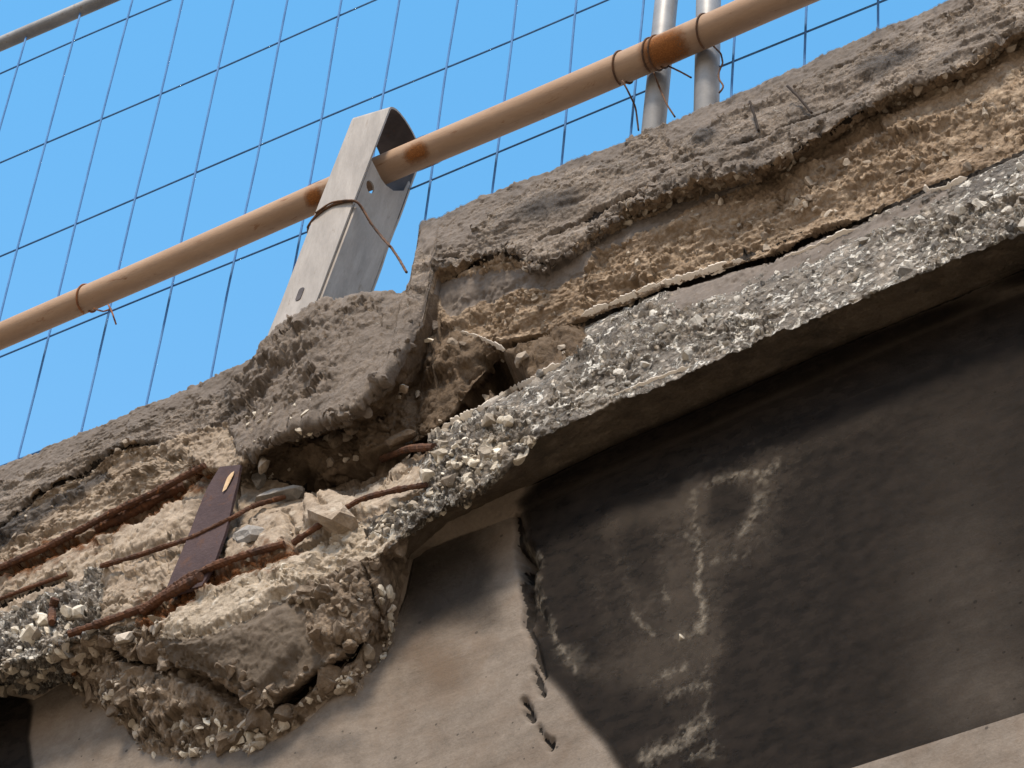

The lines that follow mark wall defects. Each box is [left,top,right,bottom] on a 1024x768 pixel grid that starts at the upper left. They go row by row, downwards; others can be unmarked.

crack [585,182,655,223]
spalling [438,32,1024,439]
crack [746,225,842,265]
crack [12,443,148,519]
rust [0,463,213,601]
rust [100,495,286,568]
spalling [0,247,587,700]
rust [345,482,428,510]
rust [67,522,323,637]
water stain [695,559,706,632]
crack [517,516,556,752]
water stain [640,720,709,761]